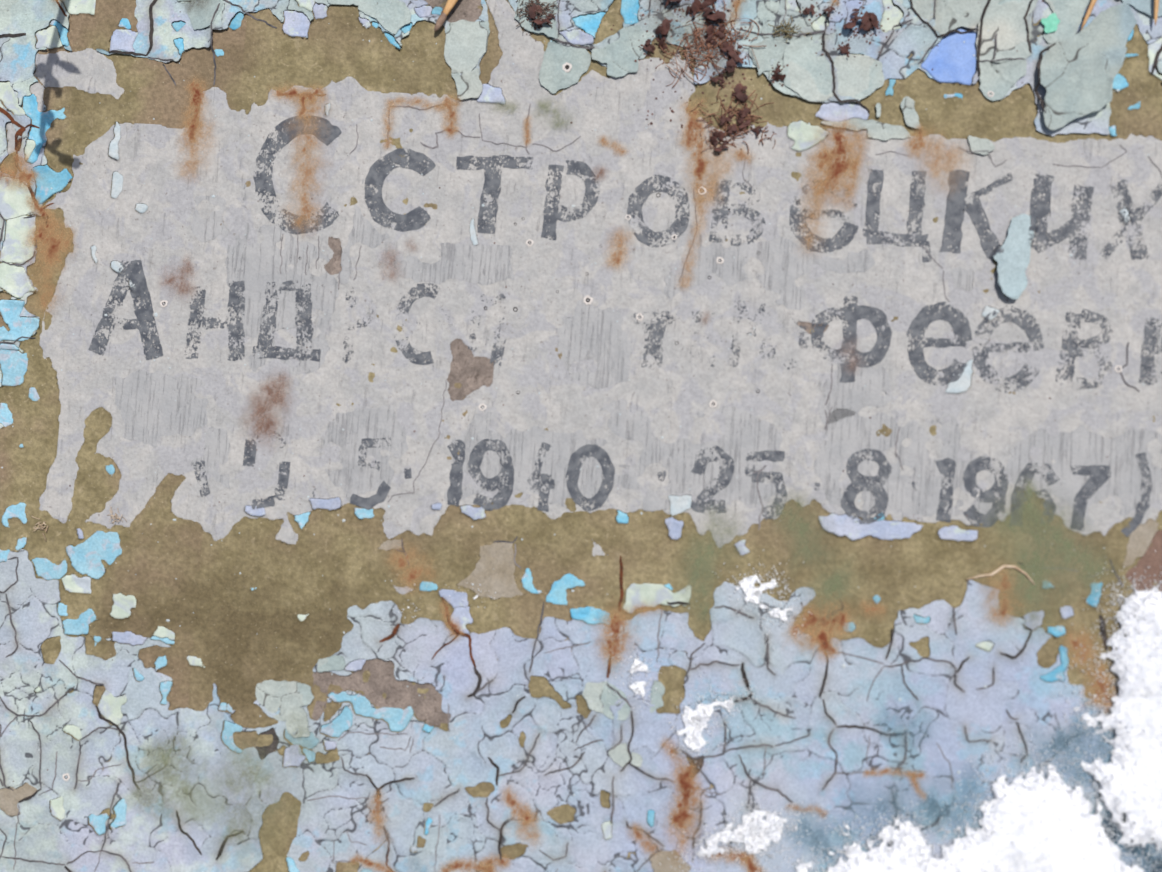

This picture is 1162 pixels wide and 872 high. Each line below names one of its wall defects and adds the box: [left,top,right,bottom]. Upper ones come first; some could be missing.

crack [735,0,870,112]
crack [877,0,1056,113]
corrosion [683,105,721,229]
corrosion [814,123,862,198]
peeling [0,3,1142,711]
crack [0,660,168,872]
peeling [222,703,286,760]
peeling [248,792,309,872]
spalling [312,658,451,737]
corrosion [442,857,509,872]
corrosion [662,743,699,852]
crack [485,598,1084,872]